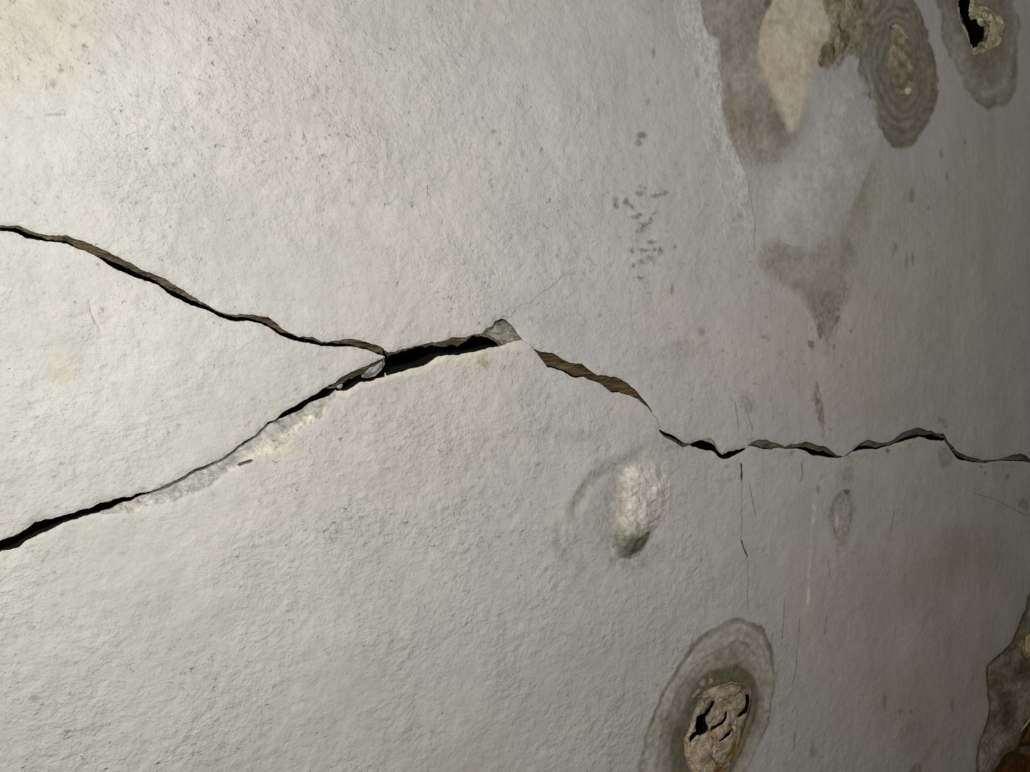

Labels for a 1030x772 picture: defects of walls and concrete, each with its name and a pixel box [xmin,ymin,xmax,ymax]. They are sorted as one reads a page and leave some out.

peeling [671,0,883,254]
water stain [753,0,1022,363]
crack [0,225,1030,613]
flaking render [976,595,1030,772]